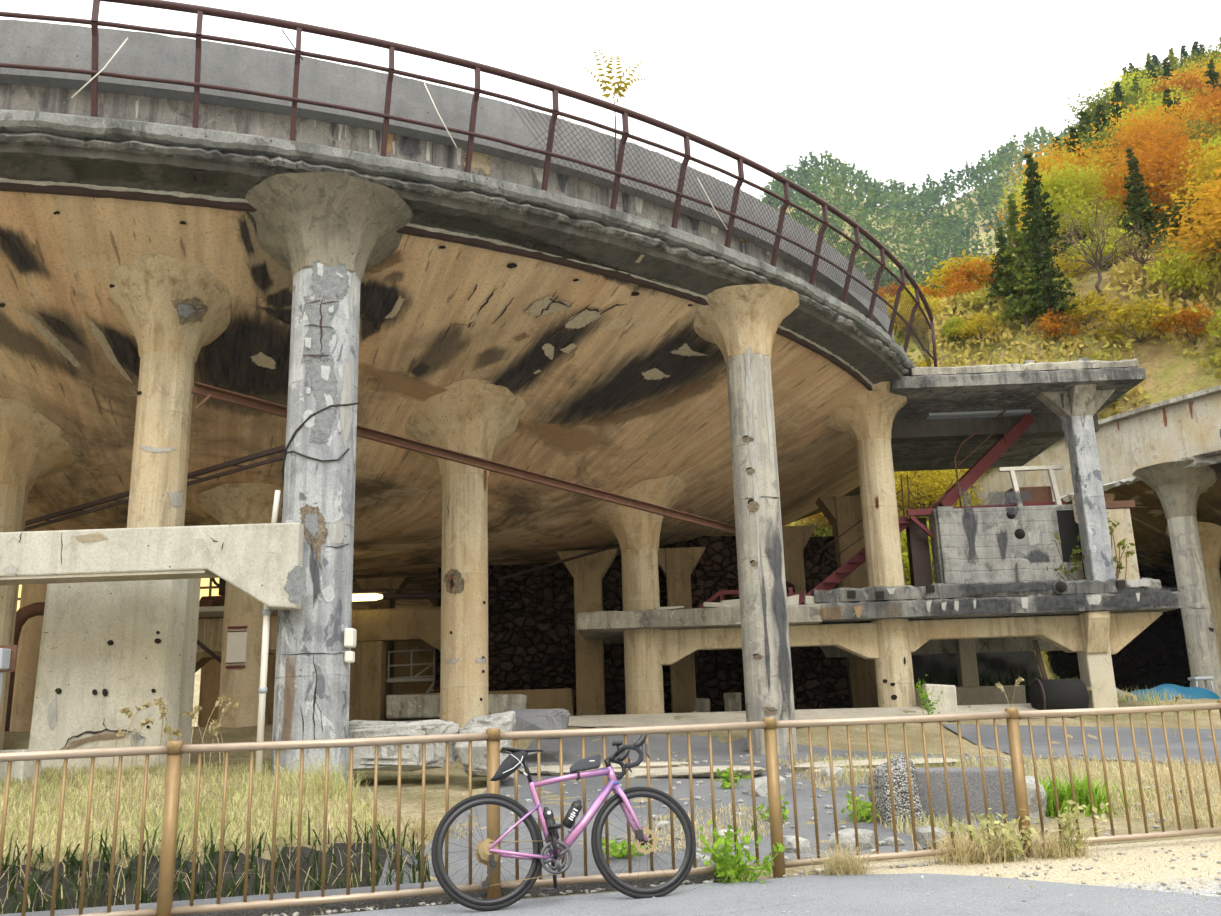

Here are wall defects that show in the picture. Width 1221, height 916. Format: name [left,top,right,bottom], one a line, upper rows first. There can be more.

leakage [0,229,47,275]
spalling [171,297,208,325]
leakage [194,307,292,414]
peeling [237,212,350,445]
leakage [490,319,599,394]
spalling [523,295,640,329]
leakage [547,321,726,426]
leakage [959,488,977,559]
leakage [986,490,1050,563]
spalling [443,568,465,596]
crack [60,718,145,750]